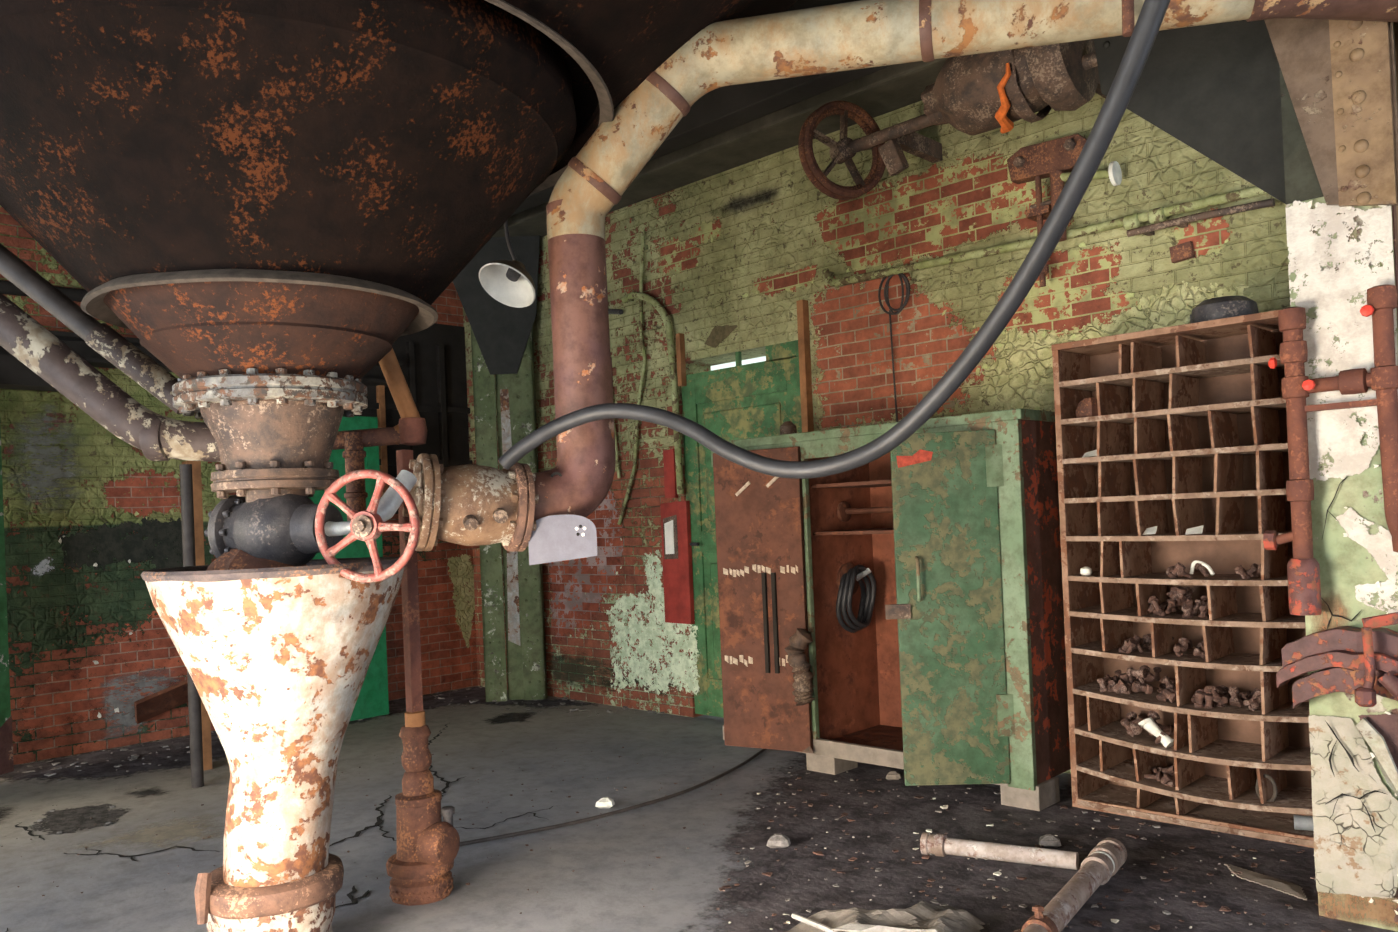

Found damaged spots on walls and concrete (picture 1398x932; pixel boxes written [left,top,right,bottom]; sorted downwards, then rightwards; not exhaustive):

peeling [657,190,777,276]
peeling [742,148,1051,430]
peeling [930,242,1143,418]
peeling [1285,200,1395,481]
peeling [31,466,183,576]
peeling [547,489,701,699]
peeling [1336,507,1398,614]
peeling [14,611,187,734]
spalling [26,804,129,835]
crack [329,795,397,847]
crack [1325,722,1388,833]
crack [335,886,369,908]